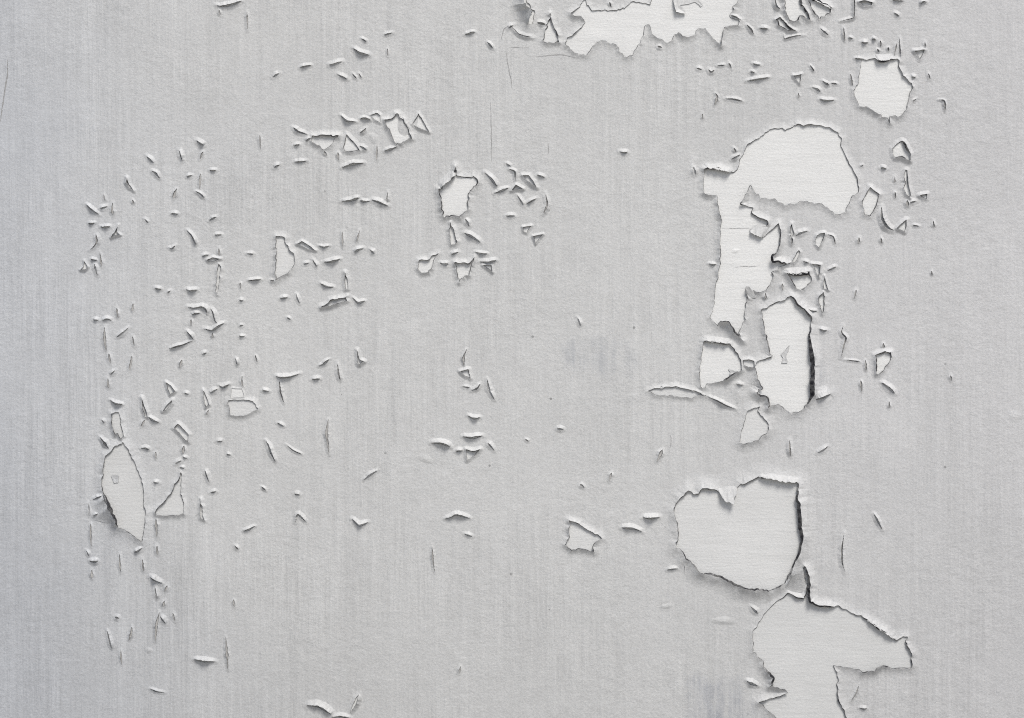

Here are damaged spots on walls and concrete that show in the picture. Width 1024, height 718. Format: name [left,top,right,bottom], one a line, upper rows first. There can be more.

peeling [83,201,123,240]
peeling [176,136,219,201]
peeling [270,108,433,171]
peeling [338,188,392,210]
peeling [412,159,548,288]
peeling [78,256,101,279]
peeling [166,209,228,358]
peeling [243,230,378,312]
peeling [457,366,498,403]
peeling [505,0,931,718]
peeling [89,356,332,555]
peeling [427,412,498,464]